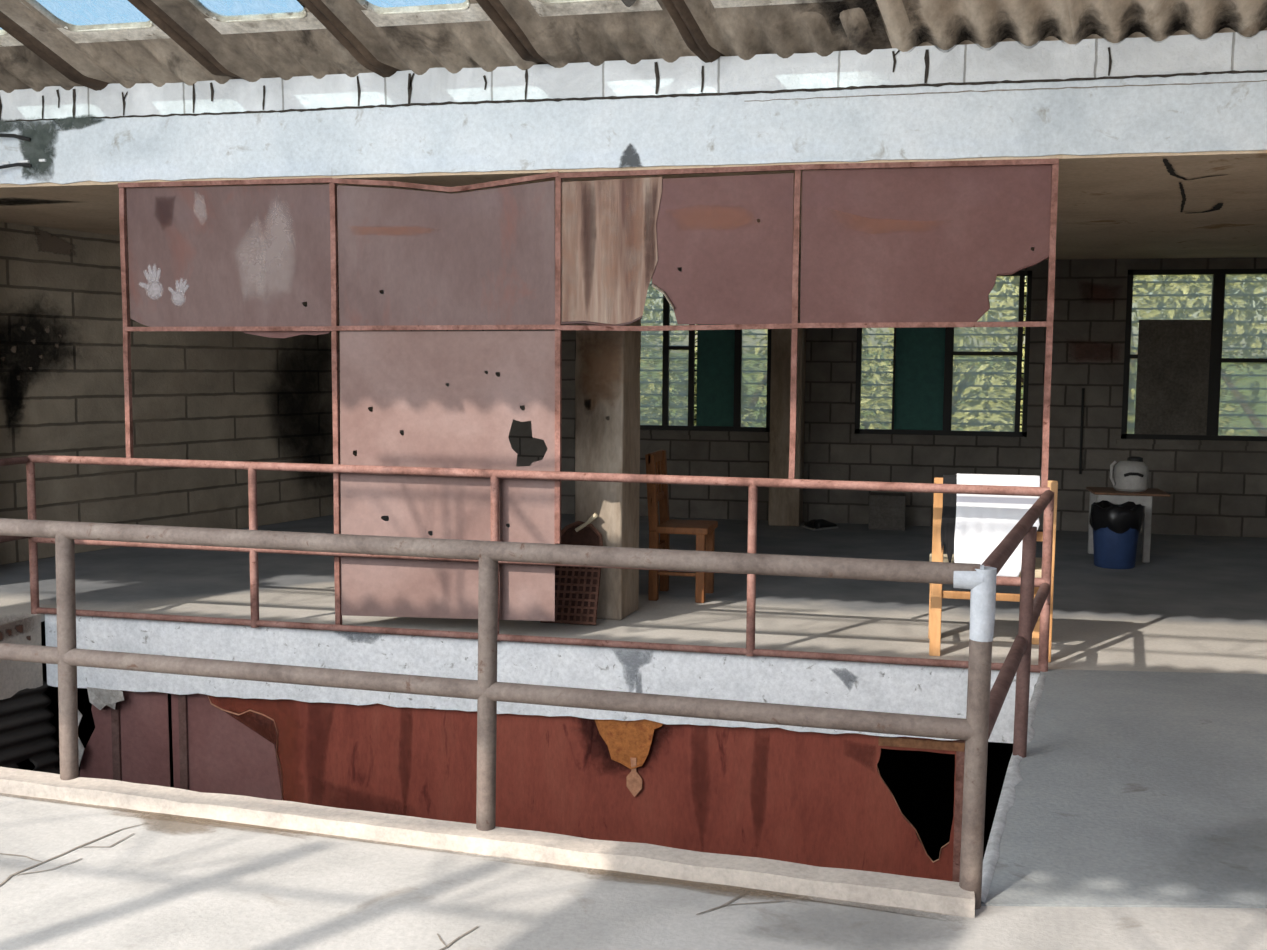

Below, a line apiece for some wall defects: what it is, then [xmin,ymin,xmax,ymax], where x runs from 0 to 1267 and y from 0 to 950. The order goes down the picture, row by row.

water stain [802,0,887,32]
water stain [0,115,102,178]
crack [1163,159,1223,214]
water stain [0,366,22,428]
corrosion [208,695,477,824]
corrosion [495,714,957,881]